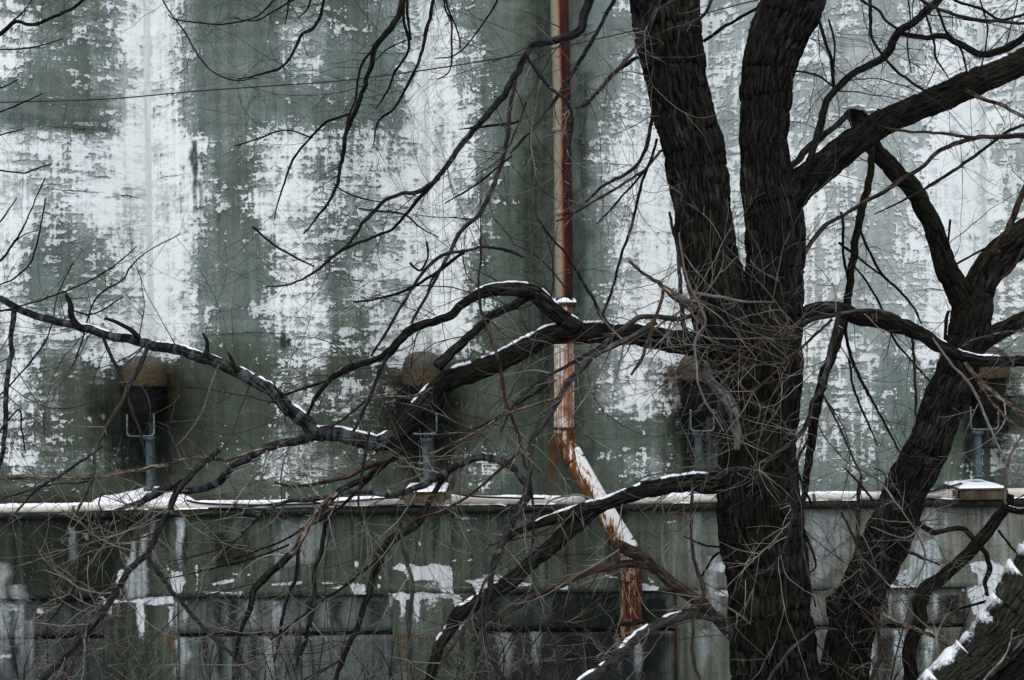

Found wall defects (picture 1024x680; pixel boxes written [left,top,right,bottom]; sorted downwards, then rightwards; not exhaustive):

peeling [0,0,520,499]
peeling [580,36,694,331]
peeling [706,0,752,270]
peeling [803,161,951,339]
peeling [787,0,1024,168]
peeling [884,77,1024,277]
peeling [991,263,1024,325]
peeling [593,345,694,482]
peeling [795,317,940,483]
spalling [100,565,250,639]
spalling [322,559,471,628]
spalling [466,574,503,592]